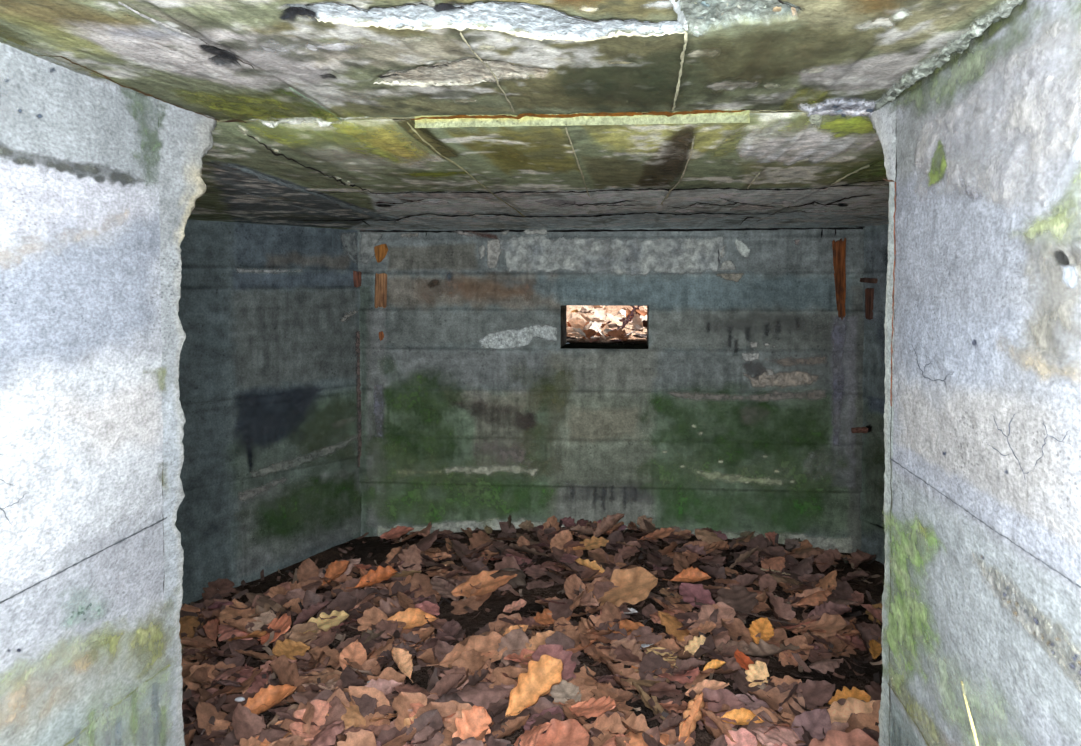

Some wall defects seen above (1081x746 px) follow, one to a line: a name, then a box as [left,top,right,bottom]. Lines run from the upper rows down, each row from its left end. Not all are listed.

spalling [288,0,801,42]
peeling [737,0,1023,164]
peeling [456,229,750,282]
spalling [480,325,557,349]
crack [36,55,1081,613]
water stain [237,385,358,500]
crack [887,646,930,746]